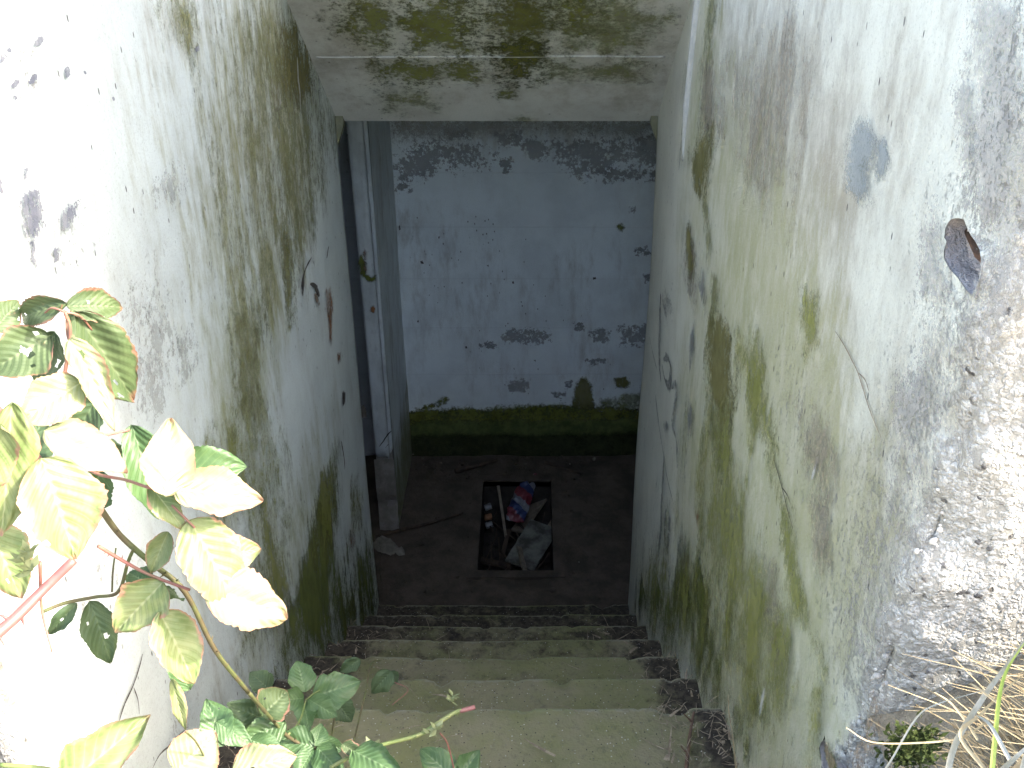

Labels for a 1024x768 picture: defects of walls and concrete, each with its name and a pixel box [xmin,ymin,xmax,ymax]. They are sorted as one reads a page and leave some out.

damp [158,0,198,54]
damp [272,19,316,112]
peeling [393,128,657,193]
peeling [19,167,81,267]
damp [284,237,292,329]
damp [684,202,718,314]
peeling [465,327,551,349]
peeling [572,322,646,348]
damp [735,328,777,466]
crack [835,331,881,437]
spalling [843,0,1024,693]
damp [764,498,807,677]